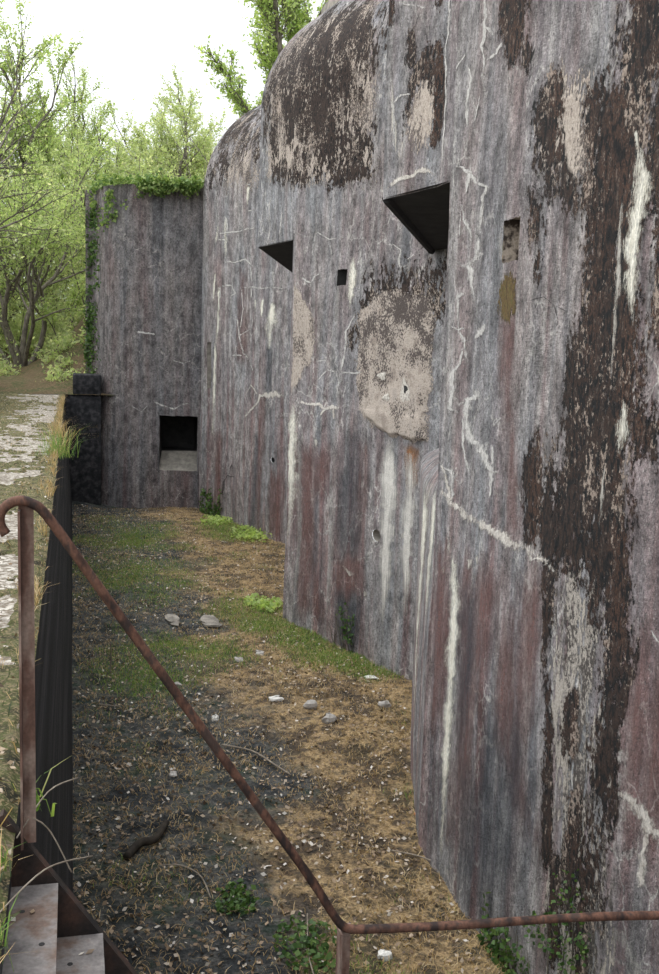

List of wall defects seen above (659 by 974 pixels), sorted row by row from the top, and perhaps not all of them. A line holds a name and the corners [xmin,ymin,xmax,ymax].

damp [203,0,447,201]
damp [255,300,277,346]
damp [347,254,447,363]
crack [391,0,553,571]
damp [287,408,303,537]
damp [380,448,436,704]
damp [440,560,471,842]
damp [497,0,659,974]